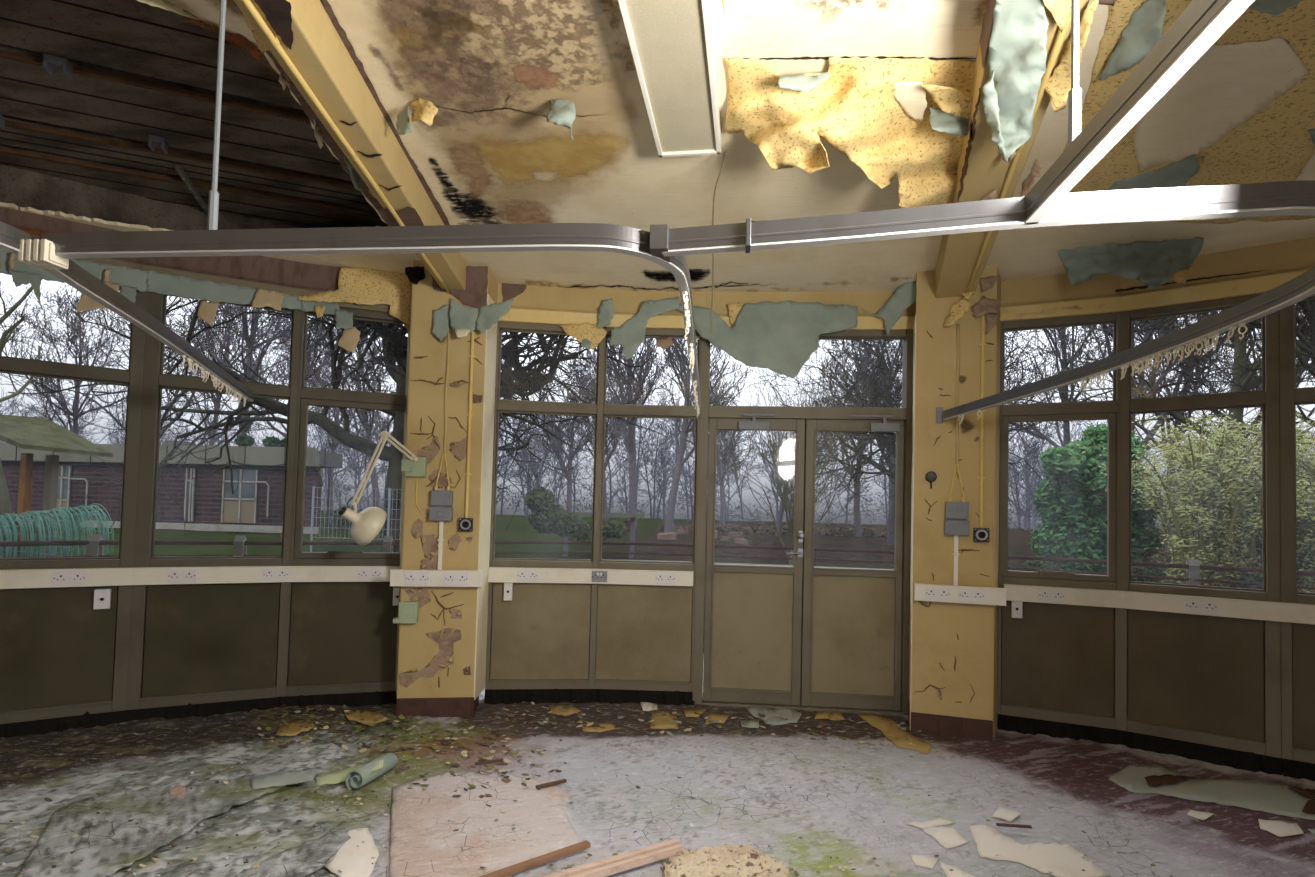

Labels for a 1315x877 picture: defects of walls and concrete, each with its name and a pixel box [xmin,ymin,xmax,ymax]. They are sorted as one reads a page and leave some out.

leakage [371,0,619,125]
peeling [980,0,996,68]
peeling [254,0,450,226]
leakage [429,135,626,225]
crack [410,337,483,385]
crack [410,416,467,488]
peeling [405,588,431,608]
crack [431,591,464,625]
peeling [398,608,471,688]
peeling [1187,810,1215,820]
peeling [1258,819,1315,837]